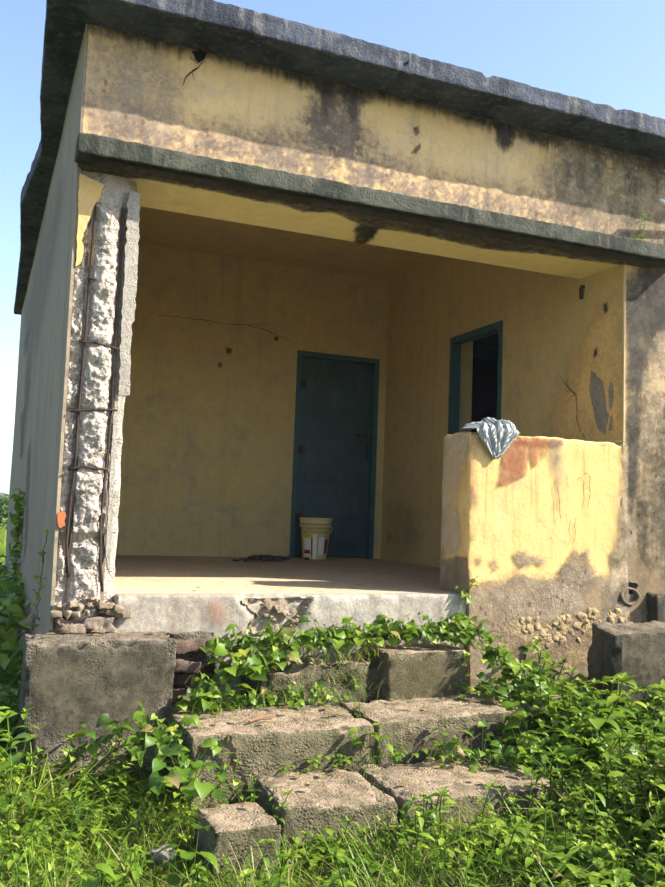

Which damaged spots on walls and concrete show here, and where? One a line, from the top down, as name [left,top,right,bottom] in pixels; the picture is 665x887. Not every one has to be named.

leakage [84,24,665,243]
spalling [50,170,140,634]
leakage [77,161,665,619]
crack [558,373,626,442]
peeling [589,371,614,434]
spalling [242,598,311,635]
spalling [469,550,627,706]